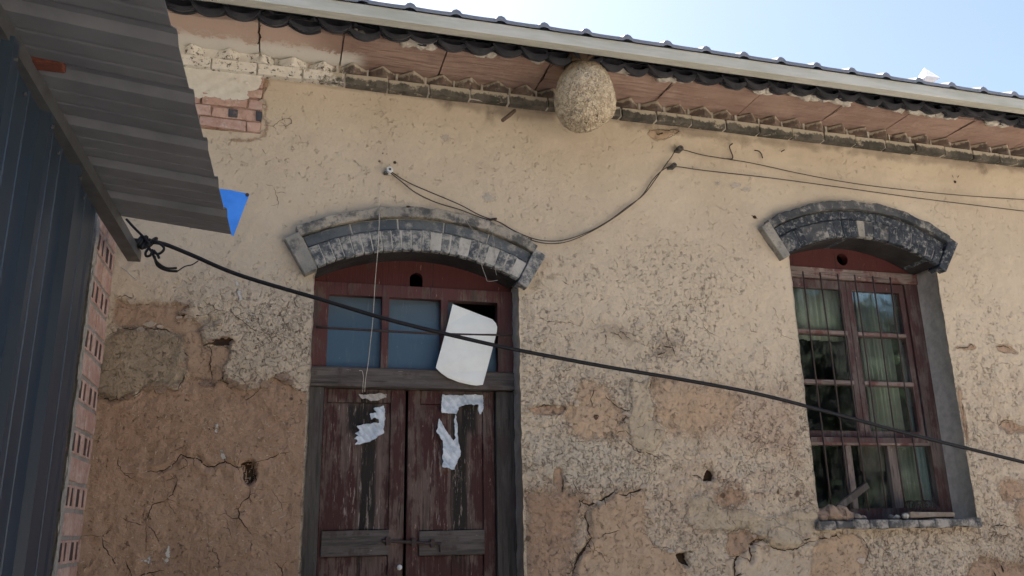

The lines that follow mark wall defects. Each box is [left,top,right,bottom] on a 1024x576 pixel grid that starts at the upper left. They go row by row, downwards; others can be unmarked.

peeling [184,48,272,142]
crack [86,443,292,576]
flaking render [76,298,307,576]
crack [566,388,667,575]
flaking render [524,377,737,458]
flaking render [575,484,690,576]
flaking render [686,483,869,576]
crack [727,479,843,576]